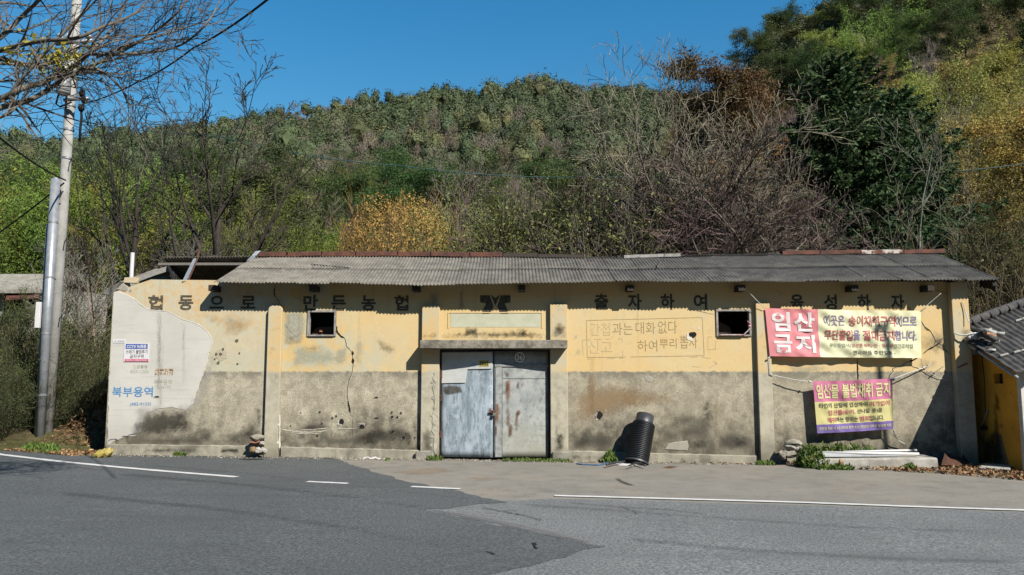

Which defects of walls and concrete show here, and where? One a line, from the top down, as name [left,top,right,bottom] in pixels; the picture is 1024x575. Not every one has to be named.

spalling [214,339,240,365]
crack [336,326,354,416]
water stain [137,412,187,451]